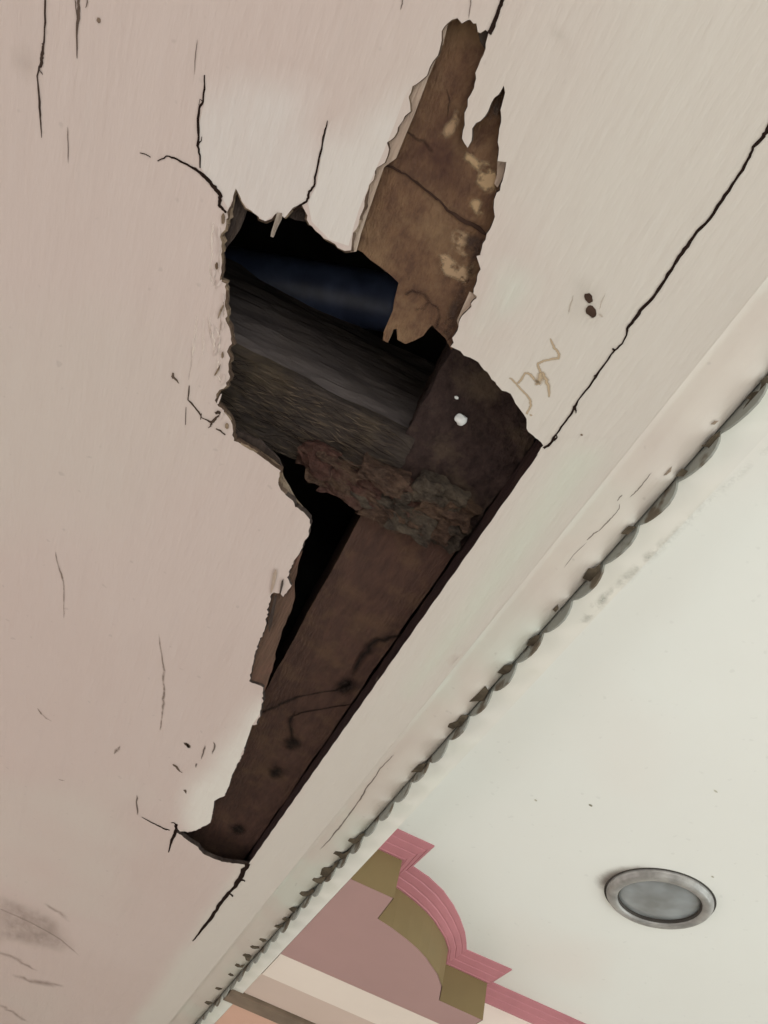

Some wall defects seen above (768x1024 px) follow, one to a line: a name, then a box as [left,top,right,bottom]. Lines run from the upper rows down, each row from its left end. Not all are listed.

crack [36,0,46,138]
crack [141,44,227,213]
crack [293,121,328,211]
damp [308,60,428,246]
peeling [465,154,506,213]
peeling [440,232,477,323]
damp [406,237,551,342]
crack [543,124,768,449]
peeling [170,688,262,831]
spalling [448,715,468,729]
crack [192,863,250,941]
spalling [299,833,365,896]